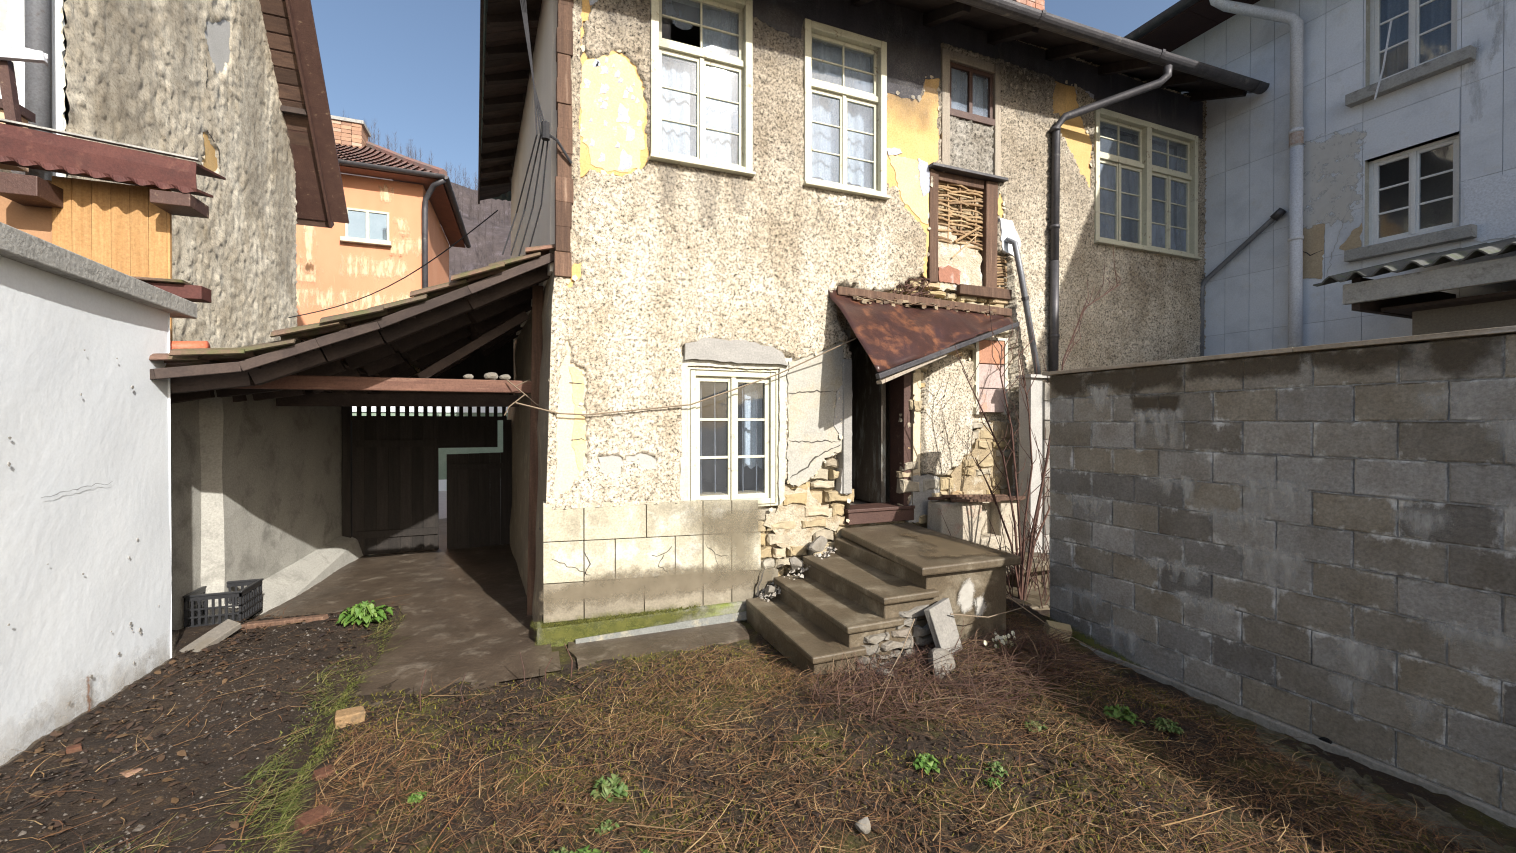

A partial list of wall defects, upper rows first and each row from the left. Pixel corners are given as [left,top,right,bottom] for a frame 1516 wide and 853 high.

peeling [572,0,649,178]
peeling [887,75,1009,309]
peeling [1052,80,1094,188]
peeling [1303,131,1367,279]
peeling [548,340,588,498]
spalling [896,340,1013,524]
peeling [958,578,986,616]